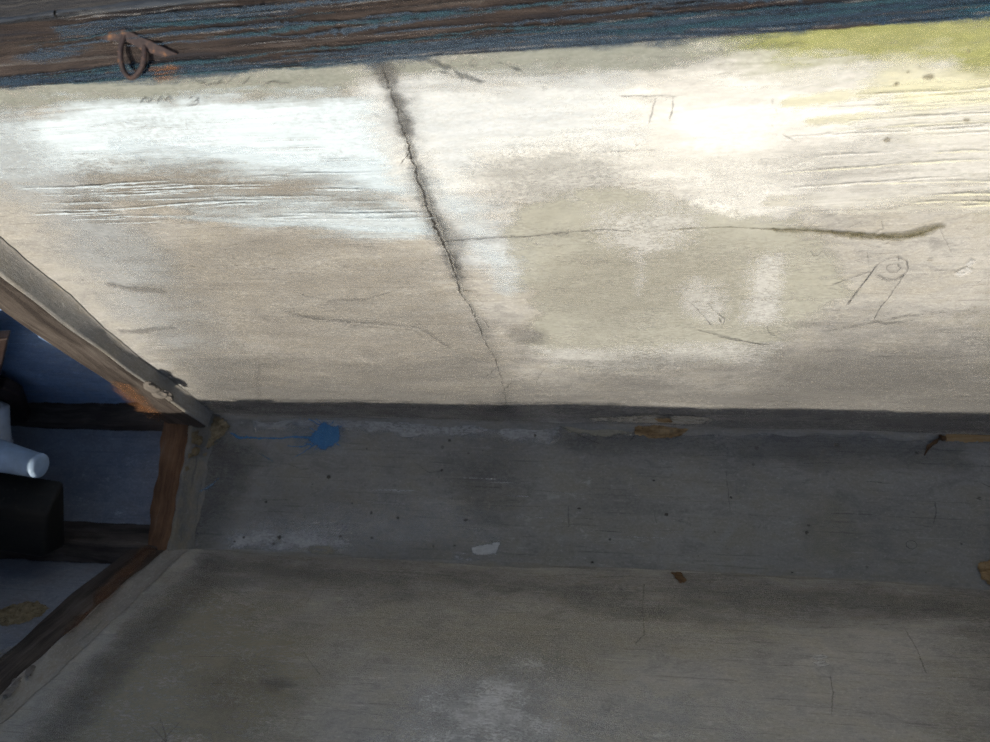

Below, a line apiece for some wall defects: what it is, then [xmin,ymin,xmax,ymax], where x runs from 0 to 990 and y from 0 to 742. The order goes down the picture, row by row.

leakage [0,0,990,110]
leakage [782,80,990,137]
leakage [0,134,436,379]
crack [372,62,583,408]
crack [616,225,943,241]
leakage [764,177,990,214]